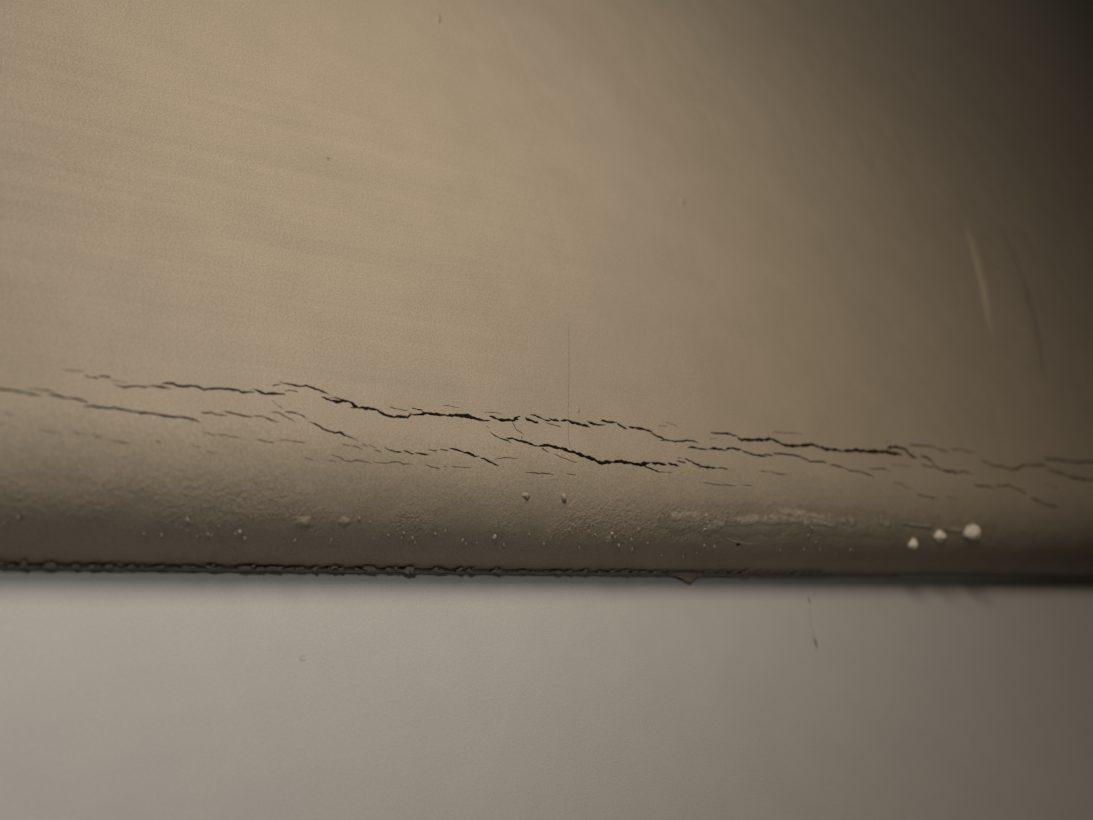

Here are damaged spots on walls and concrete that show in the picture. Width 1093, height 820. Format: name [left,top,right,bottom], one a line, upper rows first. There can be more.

crack [0,370,1093,507]